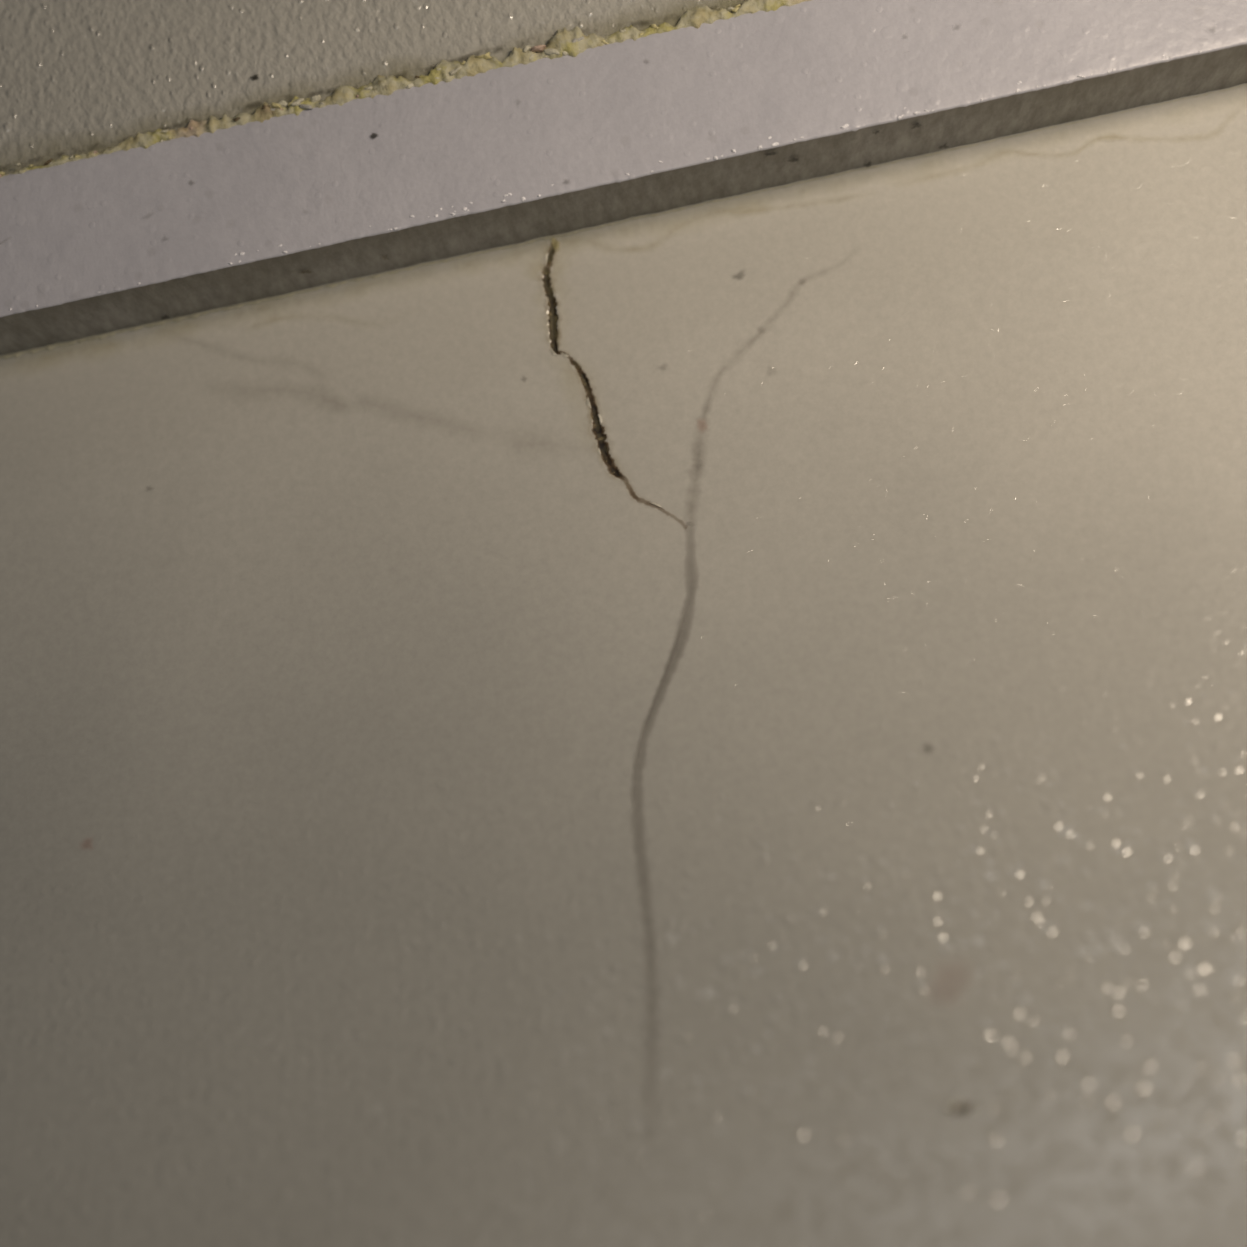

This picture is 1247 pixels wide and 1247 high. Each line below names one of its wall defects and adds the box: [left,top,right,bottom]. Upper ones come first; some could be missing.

crack [542,239,662,508]